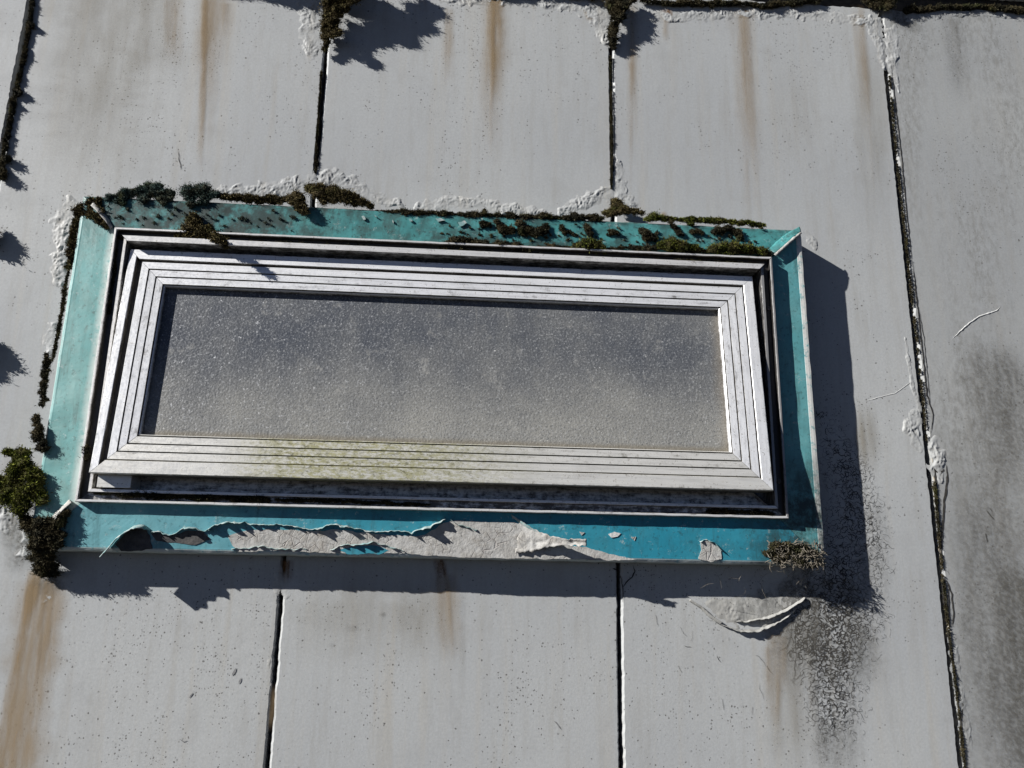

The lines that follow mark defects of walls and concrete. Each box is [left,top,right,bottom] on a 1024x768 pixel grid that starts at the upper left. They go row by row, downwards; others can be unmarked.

peeling [100,515,635,561]
peeling [698,539,723,562]
corrosion [22,574,39,635]
peeling [689,589,805,633]